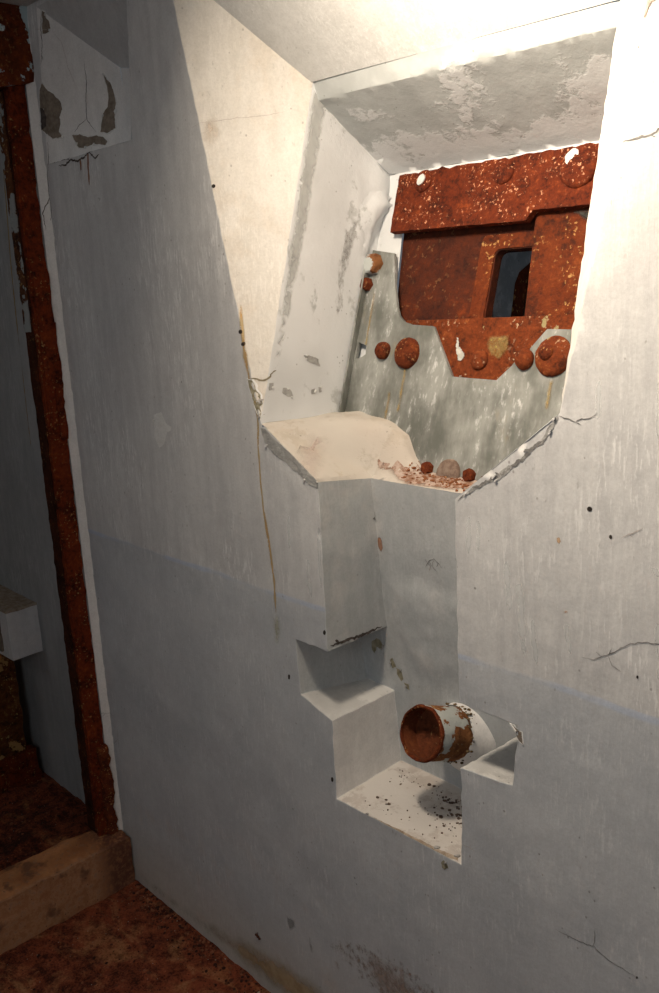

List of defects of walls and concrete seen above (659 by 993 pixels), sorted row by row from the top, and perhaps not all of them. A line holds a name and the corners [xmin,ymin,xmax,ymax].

spalling [39,72,117,149]
crack [42,152,99,227]
corrosion [378,459,476,489]
crack [458,414,596,501]
crack [330,626,382,647]
crack [582,642,659,671]
corrosion [400,704,445,763]
crack [557,930,637,978]